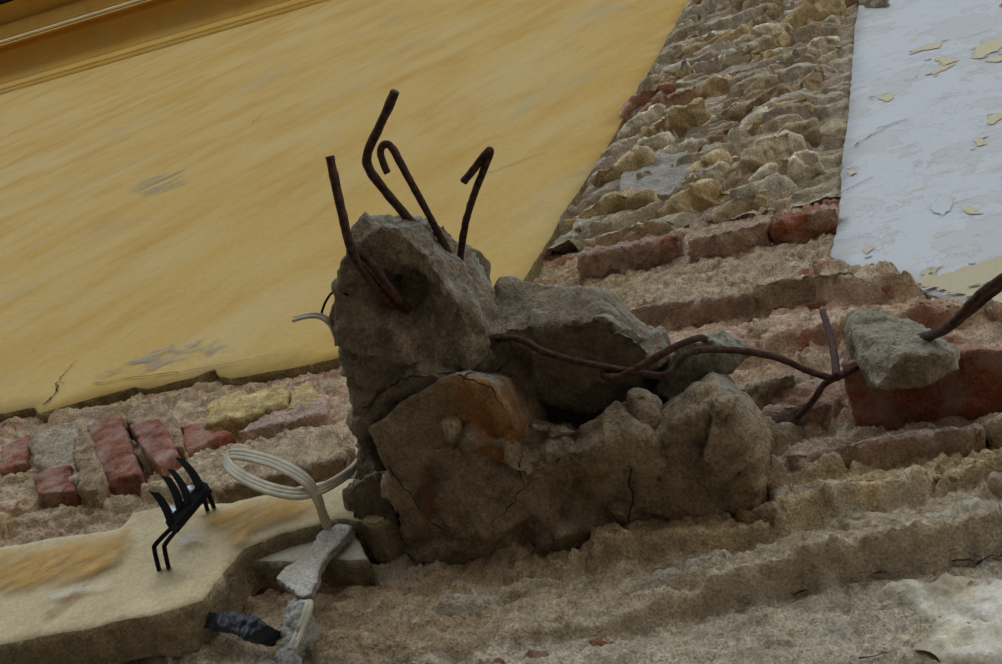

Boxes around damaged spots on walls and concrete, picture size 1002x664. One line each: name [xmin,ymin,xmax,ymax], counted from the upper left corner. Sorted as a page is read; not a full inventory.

crack [42,360,77,405]
spalling [0,366,357,597]
flaking render [302,0,1002,664]
flaking render [123,588,297,664]